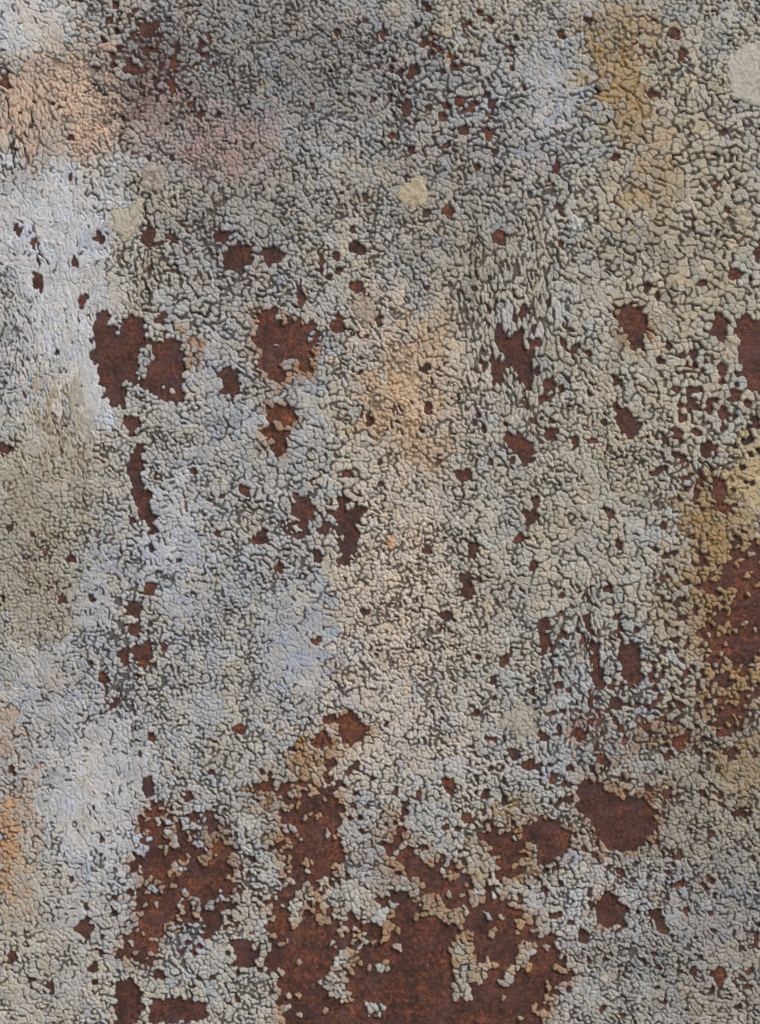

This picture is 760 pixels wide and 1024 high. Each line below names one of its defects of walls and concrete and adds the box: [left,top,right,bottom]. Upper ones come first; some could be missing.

crack [5,97,36,168]
crack [33,228,48,269]
crack [143,208,176,306]
crack [472,214,505,320]
crack [52,413,84,500]
peeling [412,91,760,773]
crack [603,413,616,491]
corrosion [683,501,753,602]
crack [82,682,120,723]
crack [578,588,596,704]
corrosion [700,665,760,700]
peeling [0,697,760,1024]